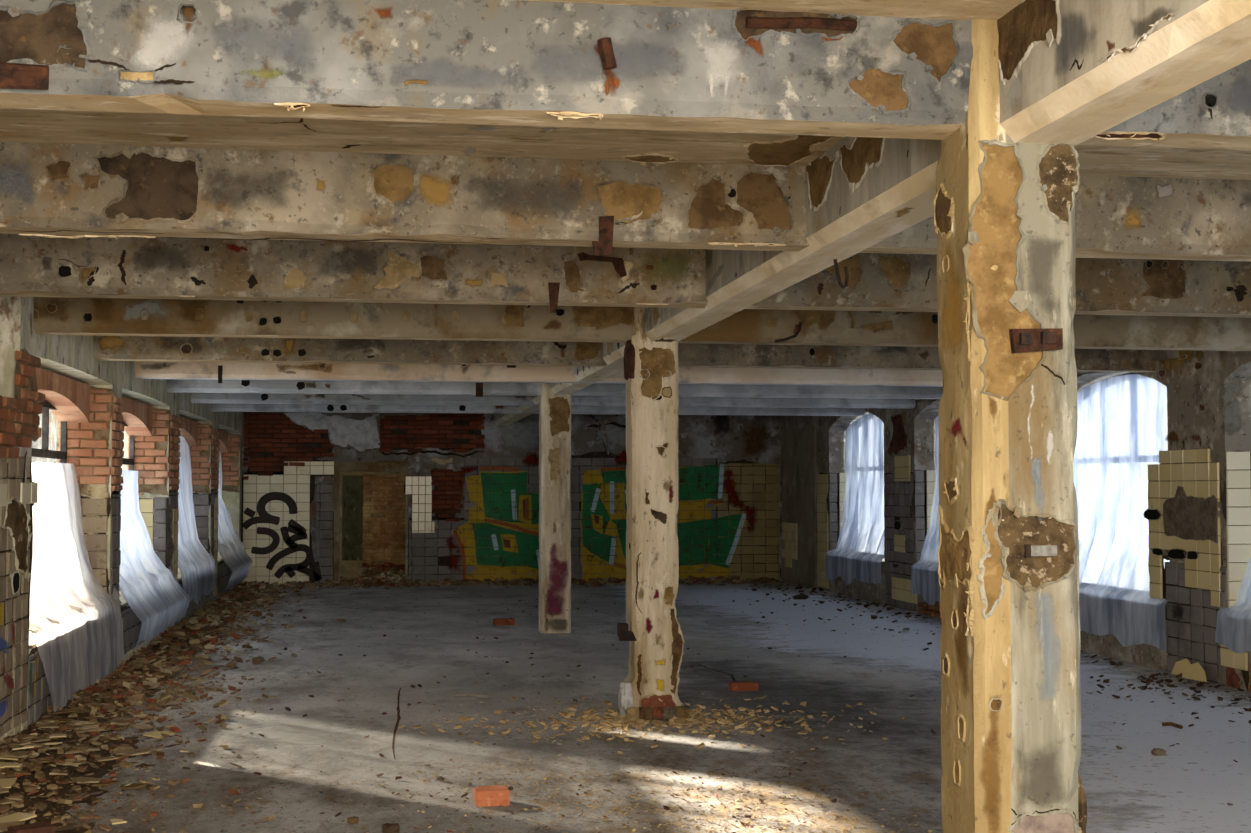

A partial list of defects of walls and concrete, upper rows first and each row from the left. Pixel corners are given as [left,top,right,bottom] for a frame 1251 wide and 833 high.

spalling [0,0,93,90]
rust [595,46,619,95]
spalling [847,18,959,115]
spalling [19,145,202,239]
spalling [686,135,885,247]
spalling [934,139,1080,401]
spalling [562,258,679,401]
flaking render [0,349,45,458]
flaking render [58,386,485,498]
flaking render [431,468,464,522]
spalling [918,477,1077,637]
peeling [1143,486,1221,560]